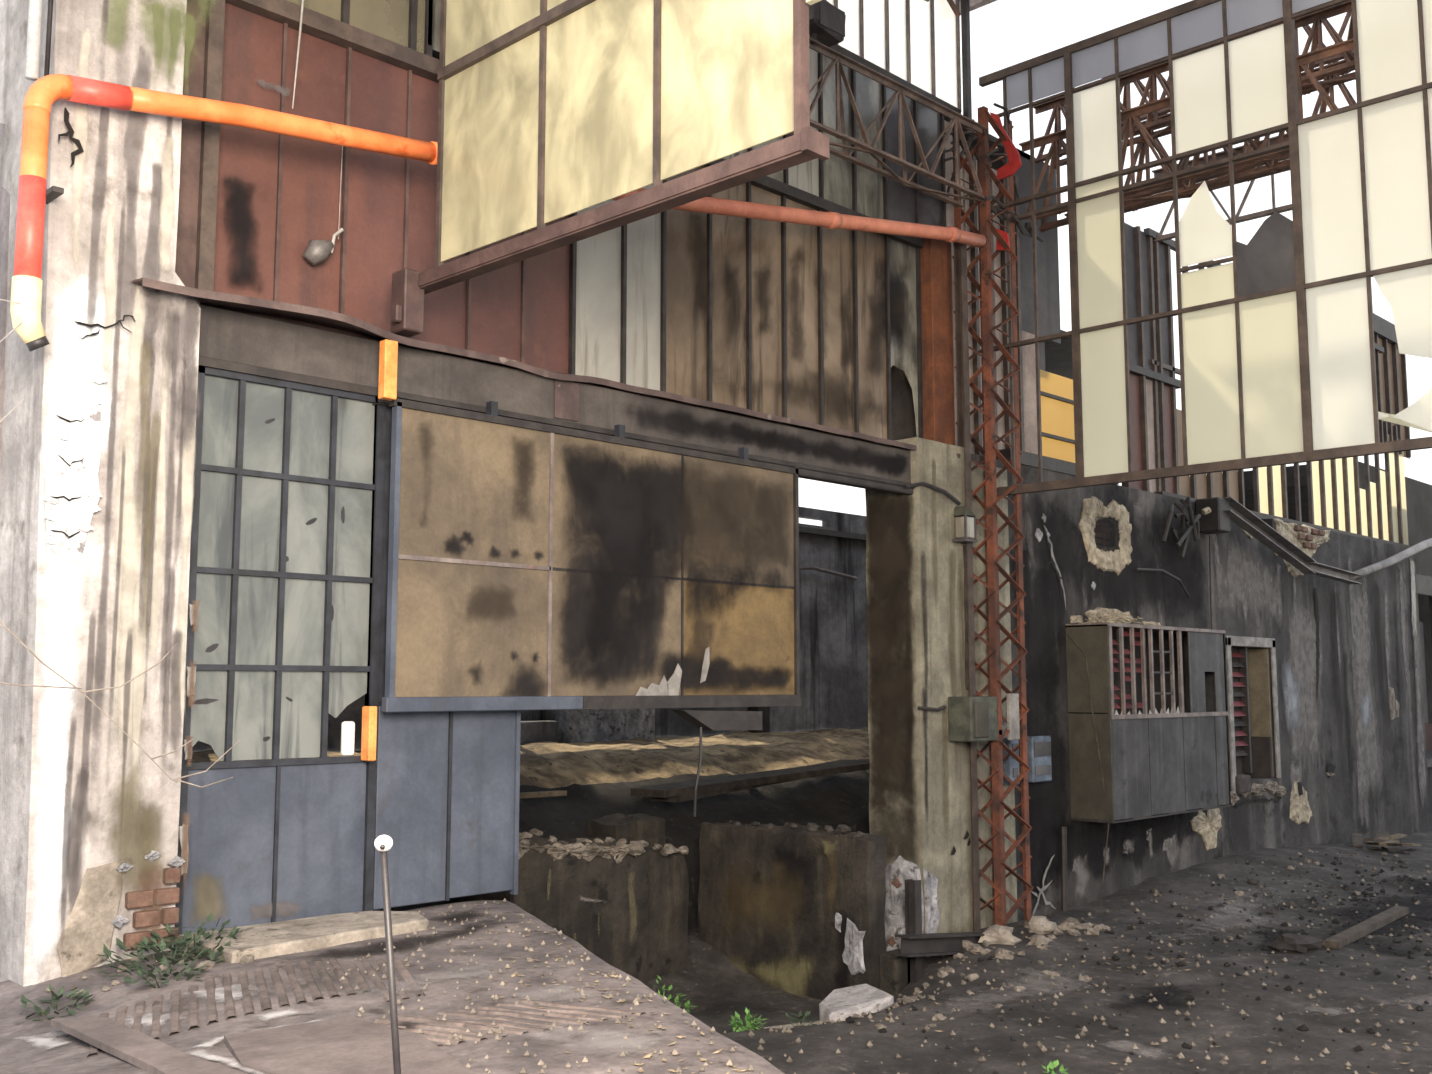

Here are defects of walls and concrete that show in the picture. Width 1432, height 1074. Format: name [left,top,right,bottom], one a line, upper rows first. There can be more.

water stain [79,31,91,78]
water stain [133,3,195,89]
peeling [54,280,113,450]
water stain [62,102,199,922]
spalling [1078,496,1133,575]
spalling [1274,552,1304,577]
spalling [1274,518,1330,557]
spalling [884,856,940,951]
peeling [1072,858,1088,895]
peeling [1103,828,1177,866]
spalling [1190,781,1312,851]